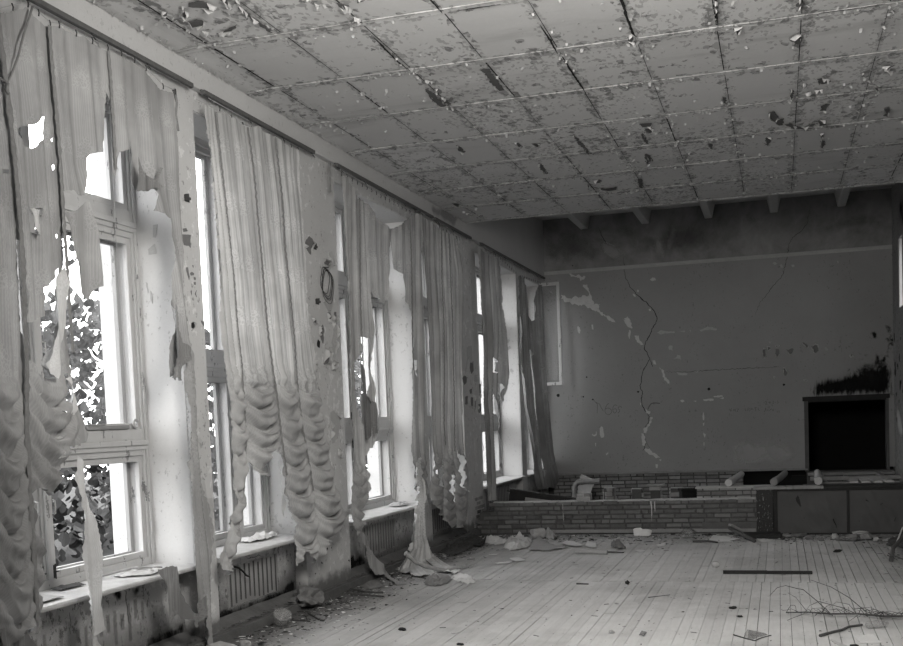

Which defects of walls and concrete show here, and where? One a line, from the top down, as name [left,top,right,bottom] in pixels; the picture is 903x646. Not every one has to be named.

peeling [182,228,191,248]
spalling [561,274,643,345]
crack [601,235,657,450]